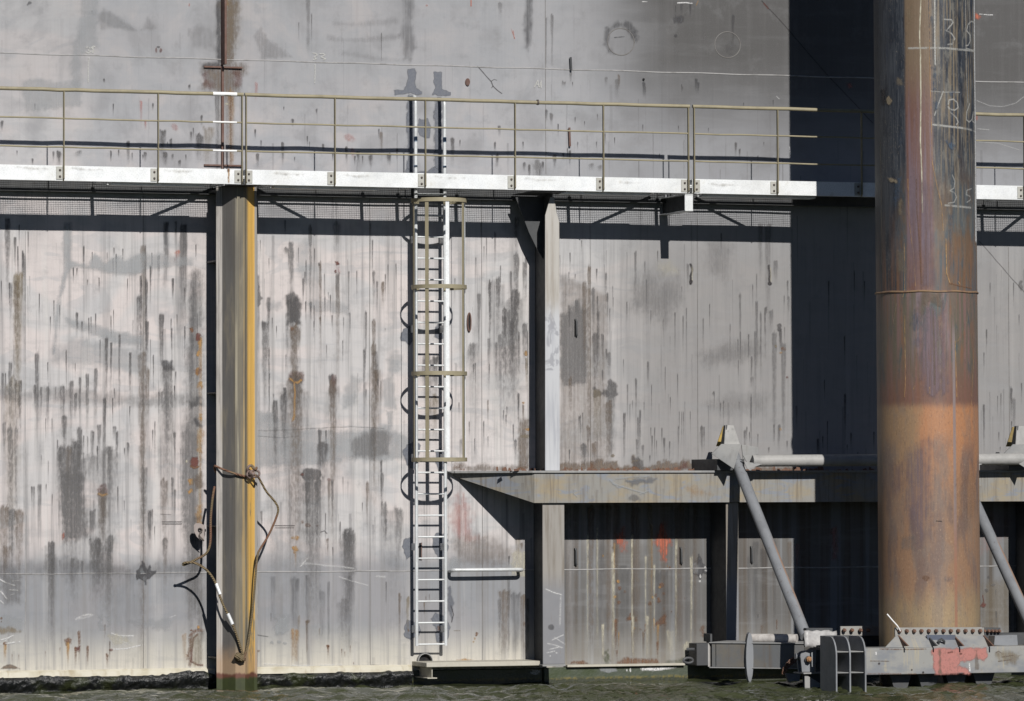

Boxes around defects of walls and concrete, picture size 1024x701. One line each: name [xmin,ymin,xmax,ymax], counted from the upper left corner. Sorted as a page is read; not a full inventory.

rust [916,2,936,284]
water stain [164,222,187,253]
water stain [1,219,29,401]
water stain [48,389,129,573]
water stain [100,335,176,393]
water stain [146,314,185,345]
rust [182,275,202,591]
rust [273,373,303,422]
water stain [261,416,402,534]
water stain [477,254,528,355]
water stain [560,267,641,444]
rust [560,454,692,471]